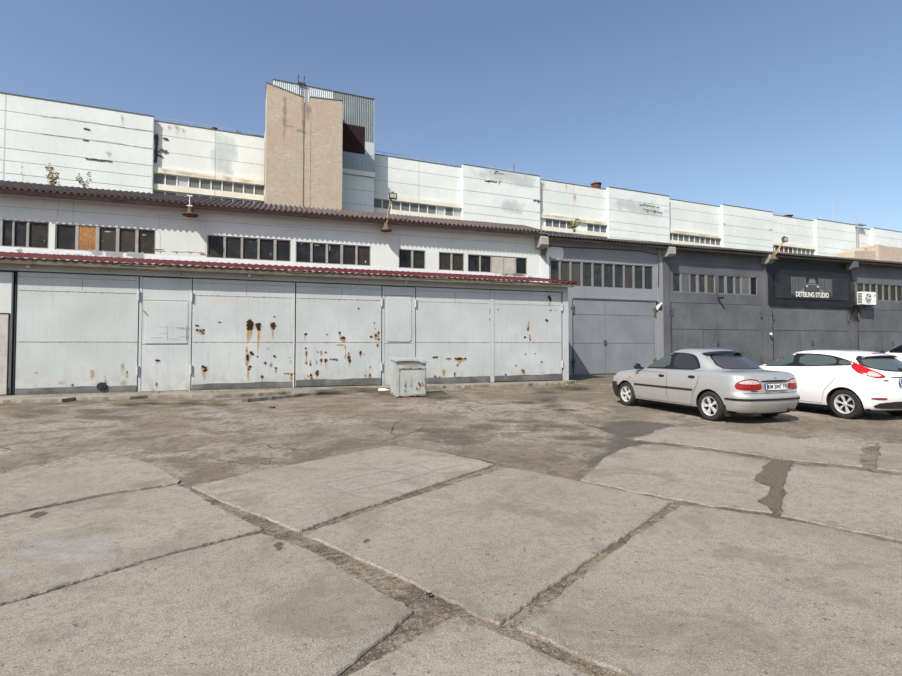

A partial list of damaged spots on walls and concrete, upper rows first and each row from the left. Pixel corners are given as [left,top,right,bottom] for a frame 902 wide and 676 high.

spalling [154,134,168,163]
rust [246,316,380,380]
rust [398,356,466,397]
spalling [754,459,792,510]